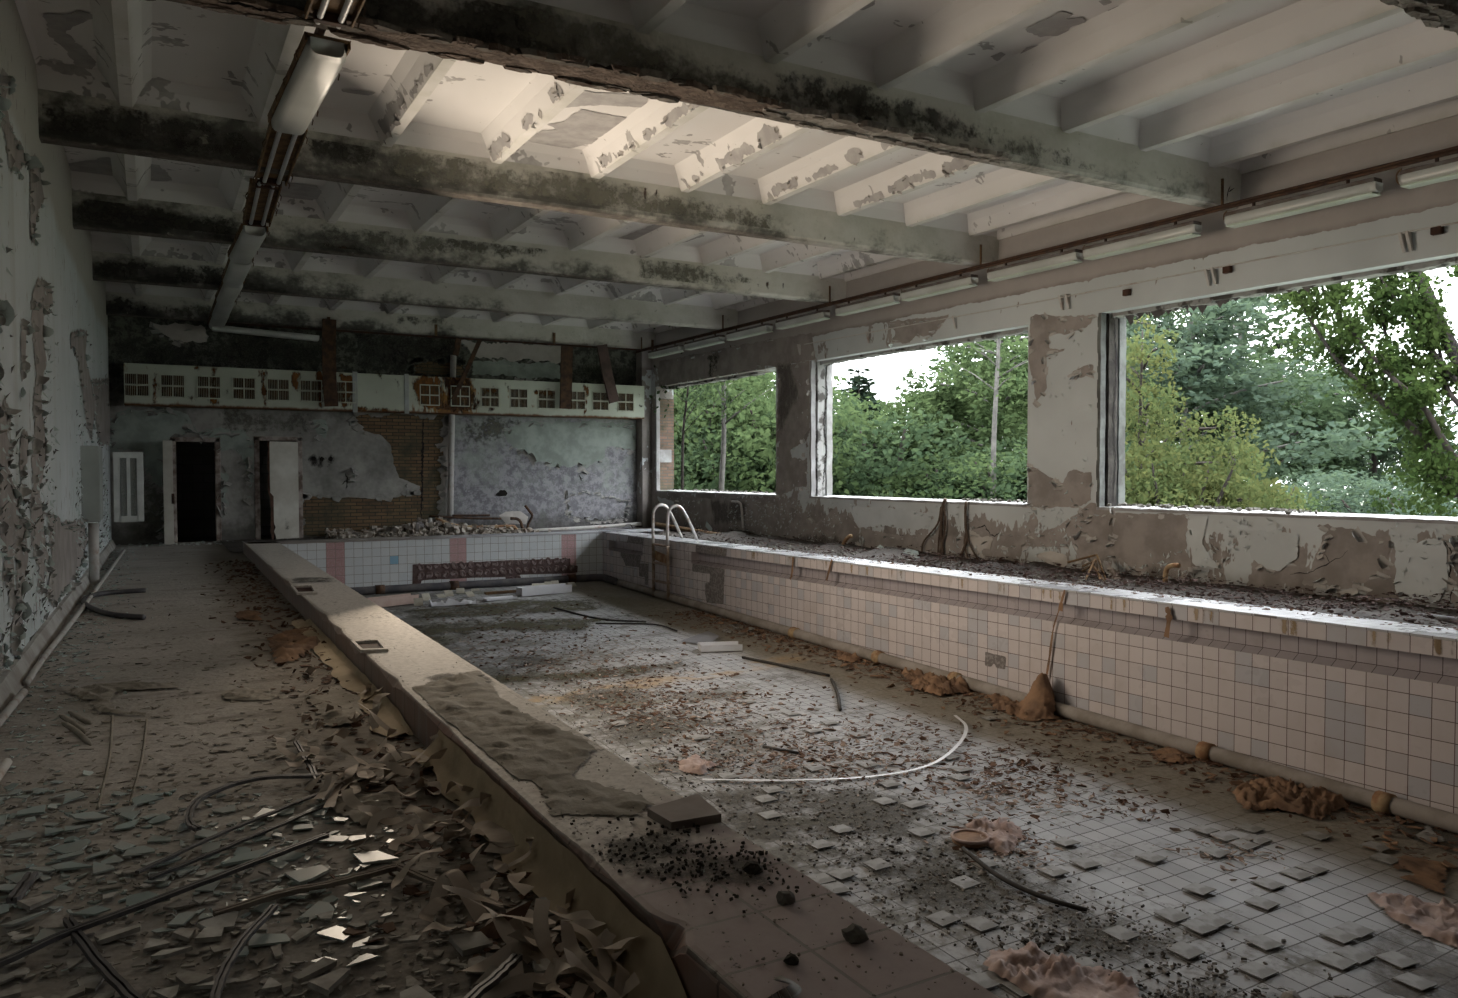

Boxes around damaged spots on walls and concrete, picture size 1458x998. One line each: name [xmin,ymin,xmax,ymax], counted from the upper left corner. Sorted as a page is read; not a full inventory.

mould [361,0,688,72]
damp [991,12,1086,61]
damp [308,139,375,166]
spalling [146,0,1013,208]
damp [528,91,648,148]
mould [717,72,1070,165]
mould [76,200,238,235]
mould [324,227,542,259]
peeling [1028,312,1097,408]
peeling [0,277,255,676]
flaking render [303,412,449,536]
peeling [502,419,649,585]